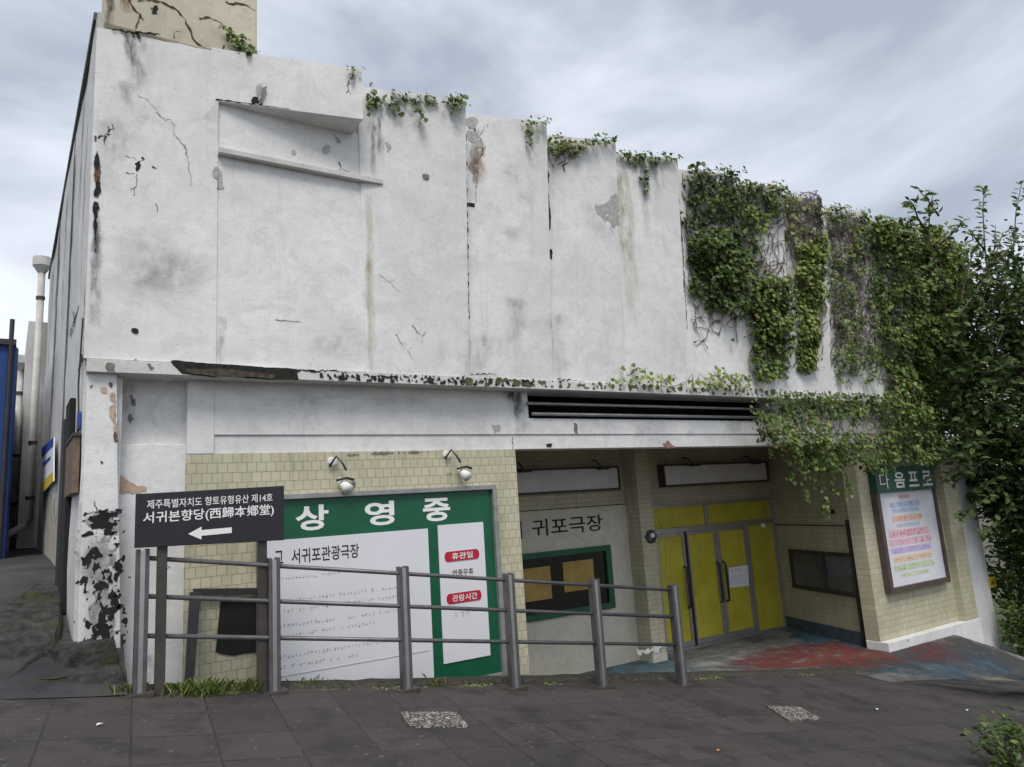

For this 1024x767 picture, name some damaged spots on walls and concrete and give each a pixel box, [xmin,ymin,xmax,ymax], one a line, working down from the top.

crack [112,0,254,50]
crack [97,124,114,144]
crack [138,95,192,186]
crack [466,127,486,319]
peeling [595,193,619,232]
spalling [171,360,299,381]
peeling [90,359,136,442]
peeling [119,475,147,494]
peeling [74,509,134,644]